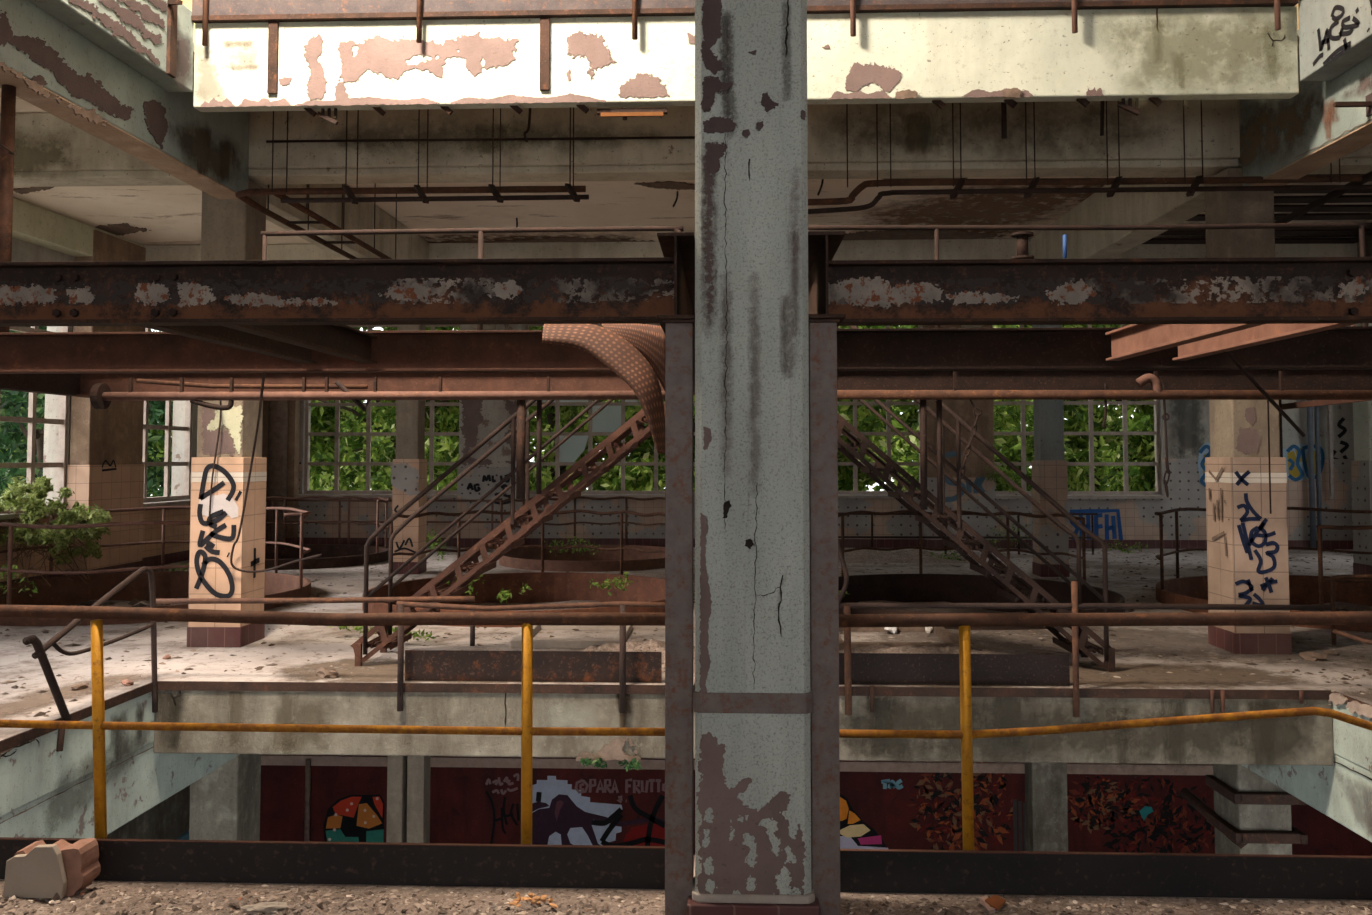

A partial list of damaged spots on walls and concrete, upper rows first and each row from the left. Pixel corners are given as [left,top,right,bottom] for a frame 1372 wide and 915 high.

peeling [0,10,169,149]
peeling [68,0,167,65]
peeling [200,31,670,107]
peeling [828,62,918,100]
peeling [960,88,1033,99]
water stain [176,128,240,180]
peeling [634,0,779,326]
peeling [696,732,807,902]